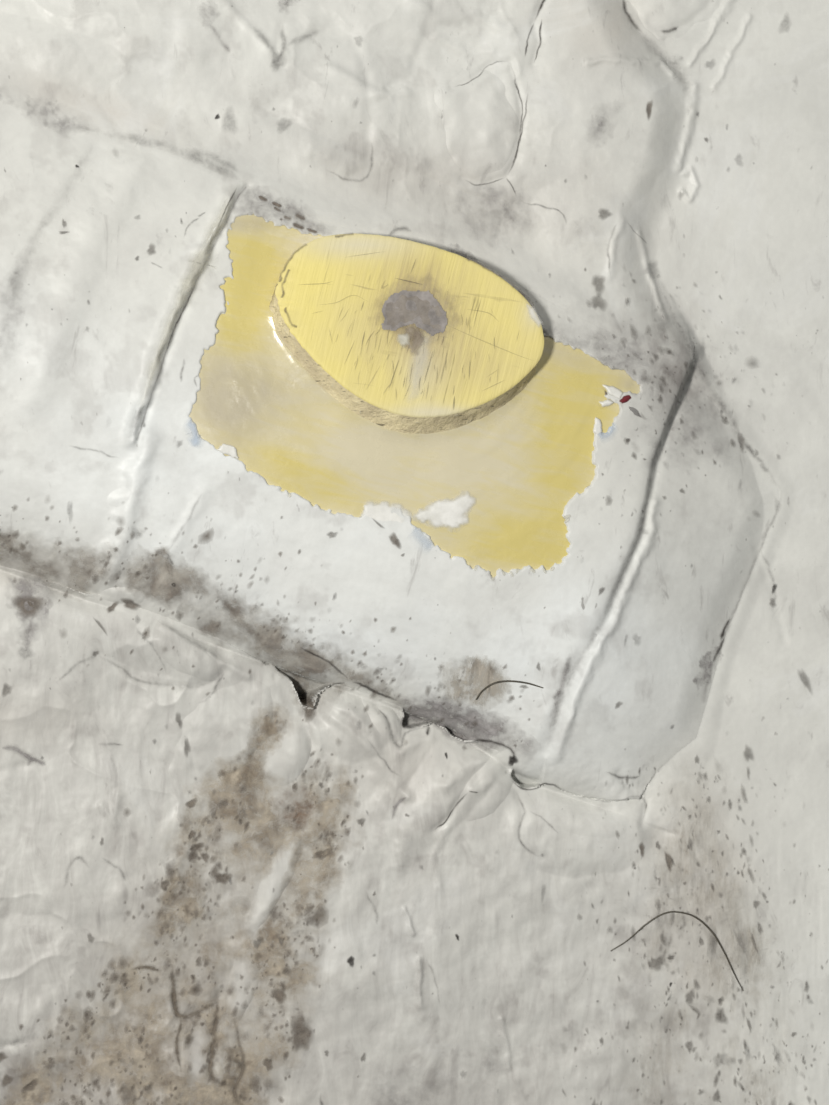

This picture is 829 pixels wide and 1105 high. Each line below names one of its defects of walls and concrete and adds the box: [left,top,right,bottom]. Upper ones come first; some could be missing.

peeling [189,196,641,580]
leakage [0,535,104,613]
leakage [128,549,207,602]
leakage [201,601,334,703]
leakage [402,658,504,746]
leakage [197,715,351,915]
leakage [157,876,203,936]
leakage [243,919,311,990]
leakage [7,1063,63,1105]
leakage [76,1000,286,1105]